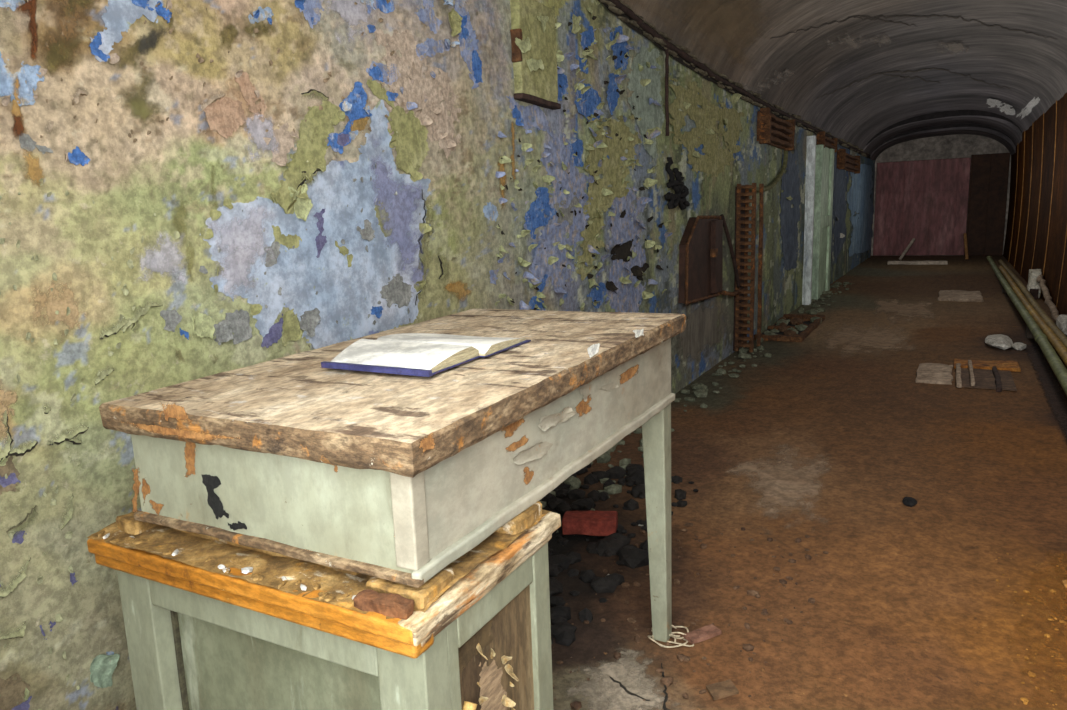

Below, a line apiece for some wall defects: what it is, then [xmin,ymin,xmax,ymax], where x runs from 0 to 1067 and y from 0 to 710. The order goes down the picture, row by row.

peeling [0,0,29,11]
peeling [89,0,174,64]
crack [598,0,1010,159]
crack [770,15,1058,40]
peeling [160,0,483,349]
peeling [483,0,792,313]
peeling [780,149,801,271]
peeling [833,164,874,259]
crack [609,663,670,710]